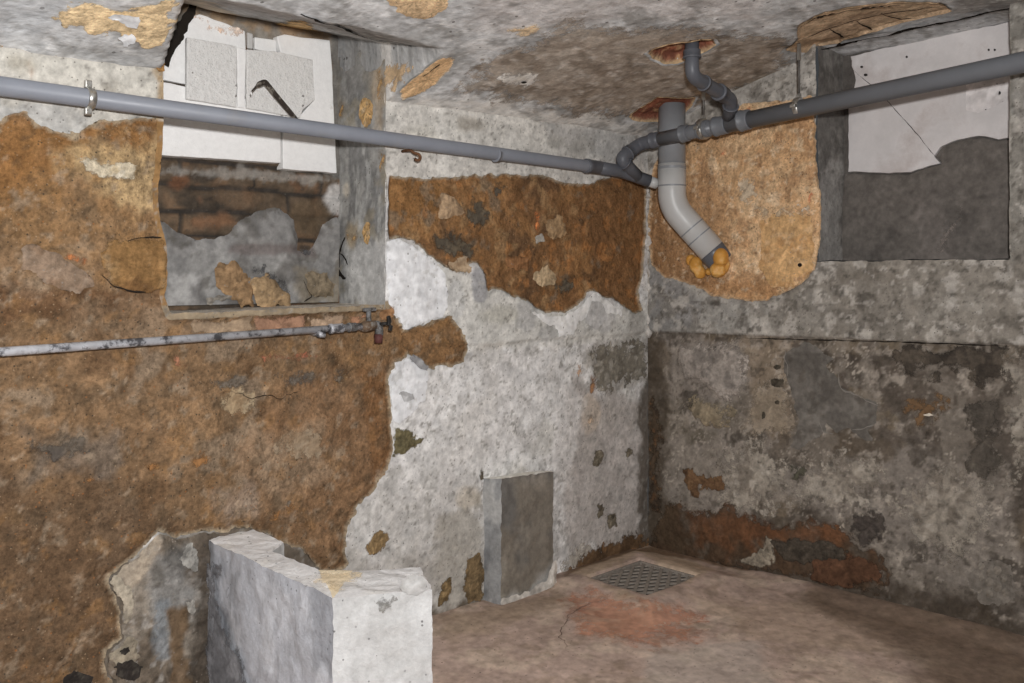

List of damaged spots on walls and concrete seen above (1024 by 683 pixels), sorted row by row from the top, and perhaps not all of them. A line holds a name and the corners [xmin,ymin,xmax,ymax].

peeling [51,0,180,49]
spalling [786,1,952,53]
spalling [359,97,373,127]
spalling [381,57,455,100]
spalling [738,95,812,110]
peeling [966,76,1010,113]
spalling [0,111,822,683]
leakage [648,396,664,513]
leakage [712,344,1024,564]
corrosion [650,501,892,596]